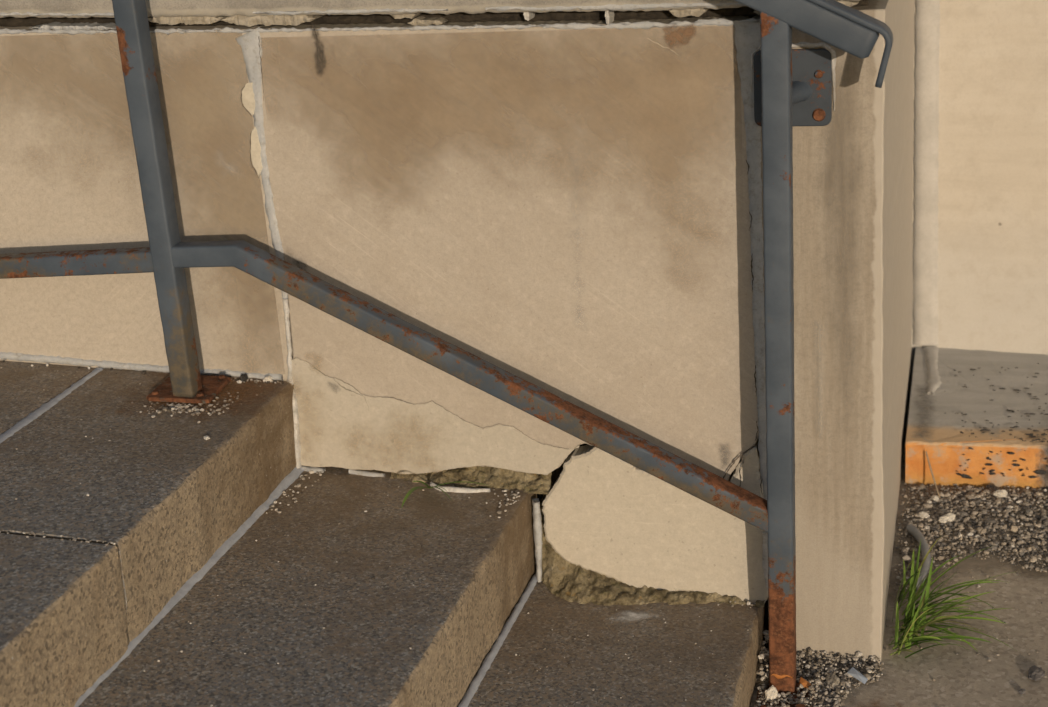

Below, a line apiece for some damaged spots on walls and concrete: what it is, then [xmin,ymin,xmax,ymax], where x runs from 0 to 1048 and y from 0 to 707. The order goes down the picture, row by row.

peeling [241,82,263,178]
water stain [268,21,738,183]
crack [291,357,568,449]
crack [723,421,762,493]
spalling [390,466,765,607]